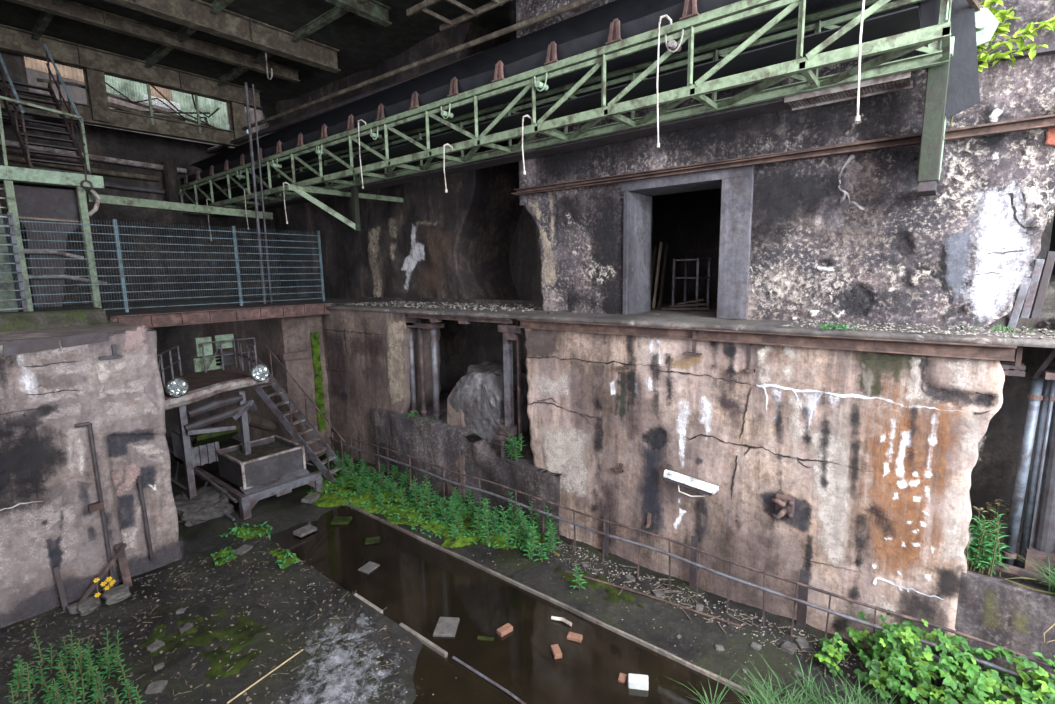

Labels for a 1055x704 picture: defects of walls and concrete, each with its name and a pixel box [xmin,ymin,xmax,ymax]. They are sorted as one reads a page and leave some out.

leakage [401,226,425,289]
spalling [572,242,616,284]
leakage [6,406,57,428]
leakage [0,430,183,628]
crack [528,398,597,425]
leakage [542,399,614,546]
leakage [580,335,688,465]
leakage [641,447,666,532]
leakage [674,500,707,542]
leakage [701,341,742,433]
leakage [758,346,892,576]
rust [860,412,949,577]